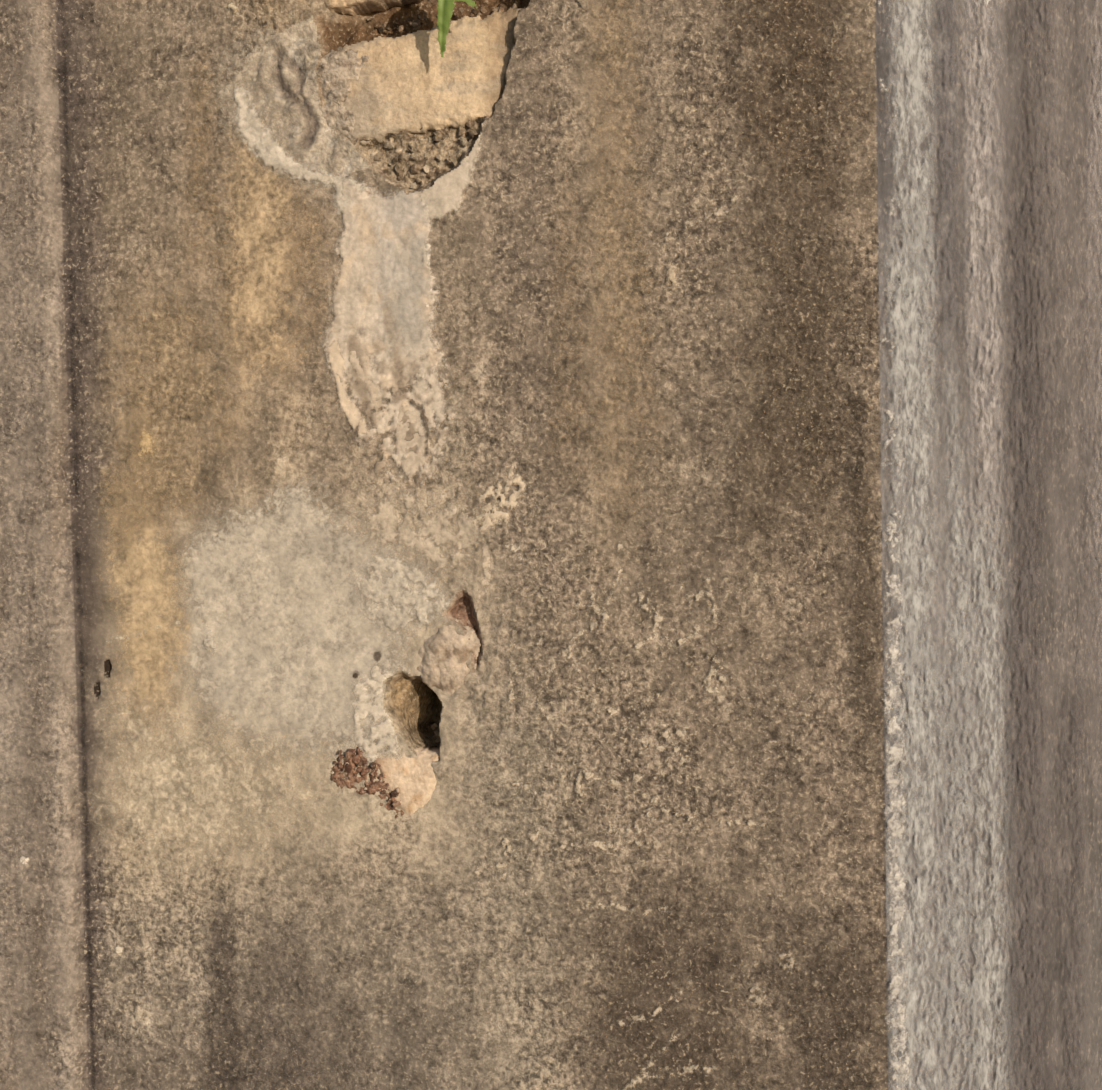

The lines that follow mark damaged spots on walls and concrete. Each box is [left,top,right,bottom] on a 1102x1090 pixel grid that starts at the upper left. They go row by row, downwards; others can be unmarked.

water stain [96,298,312,866]
water stain [192,142,323,371]
spalling [207,0,530,818]